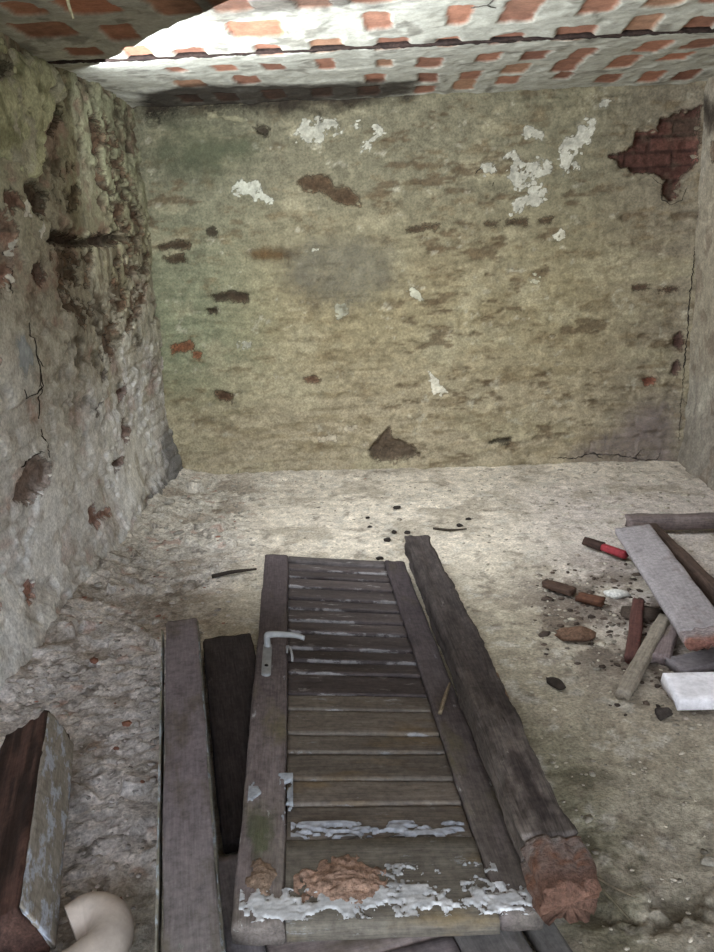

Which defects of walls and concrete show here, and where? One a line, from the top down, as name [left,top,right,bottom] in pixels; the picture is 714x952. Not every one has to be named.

spalling [608,105,714,202]
spalling [0,105,192,382]
crack [21,323,50,468]